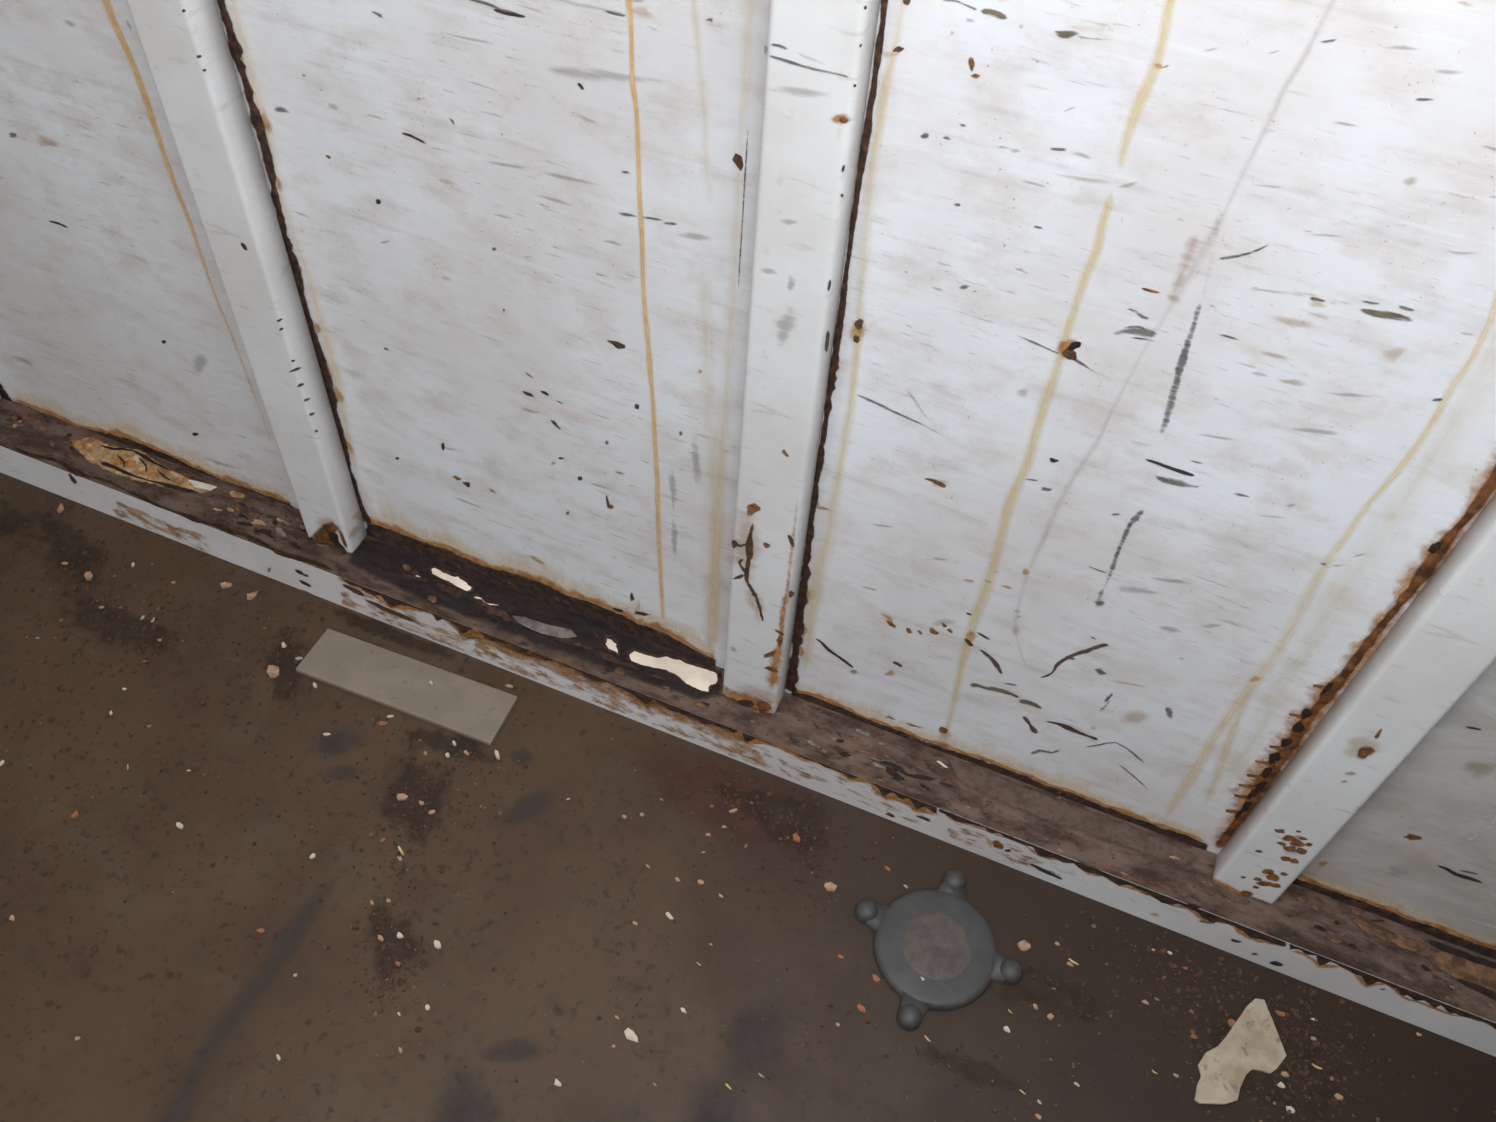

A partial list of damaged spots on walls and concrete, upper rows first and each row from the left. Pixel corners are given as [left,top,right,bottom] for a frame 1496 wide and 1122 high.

peeling [38,426,307,549]
rust [217,0,1496,1030]
peeling [464,607,577,638]
peeling [1311,904,1496,1001]